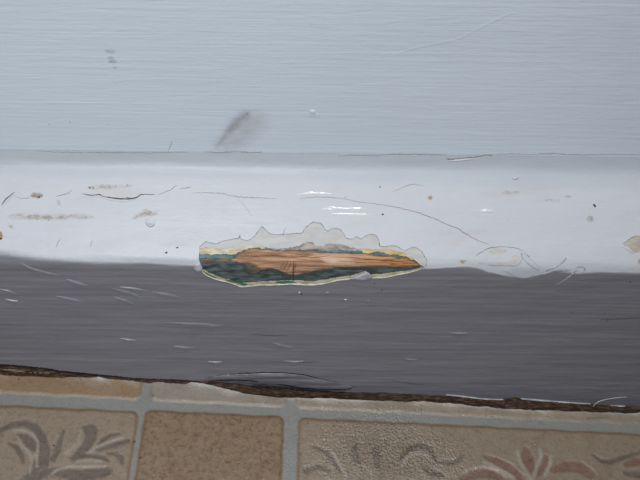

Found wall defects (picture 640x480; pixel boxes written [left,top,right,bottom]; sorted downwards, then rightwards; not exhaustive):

crack [85,194,155,202]
peeling [622,236,640,254]
peeling [193,222,427,287]